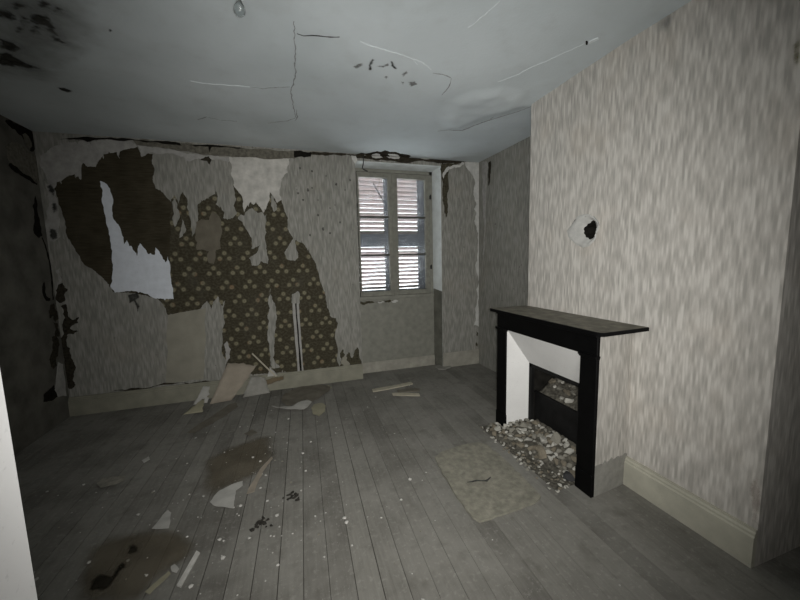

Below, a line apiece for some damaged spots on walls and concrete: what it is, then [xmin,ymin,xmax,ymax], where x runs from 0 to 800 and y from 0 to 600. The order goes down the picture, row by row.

mould [0,1,64,43]
mould [0,39,33,68]
crack [192,21,338,123]
crack [360,41,451,95]
spalling [351,150,410,164]
flaking render [5,120,311,266]
flaking render [100,181,174,300]
peeling [267,295,280,369]
flaking render [44,362,67,402]